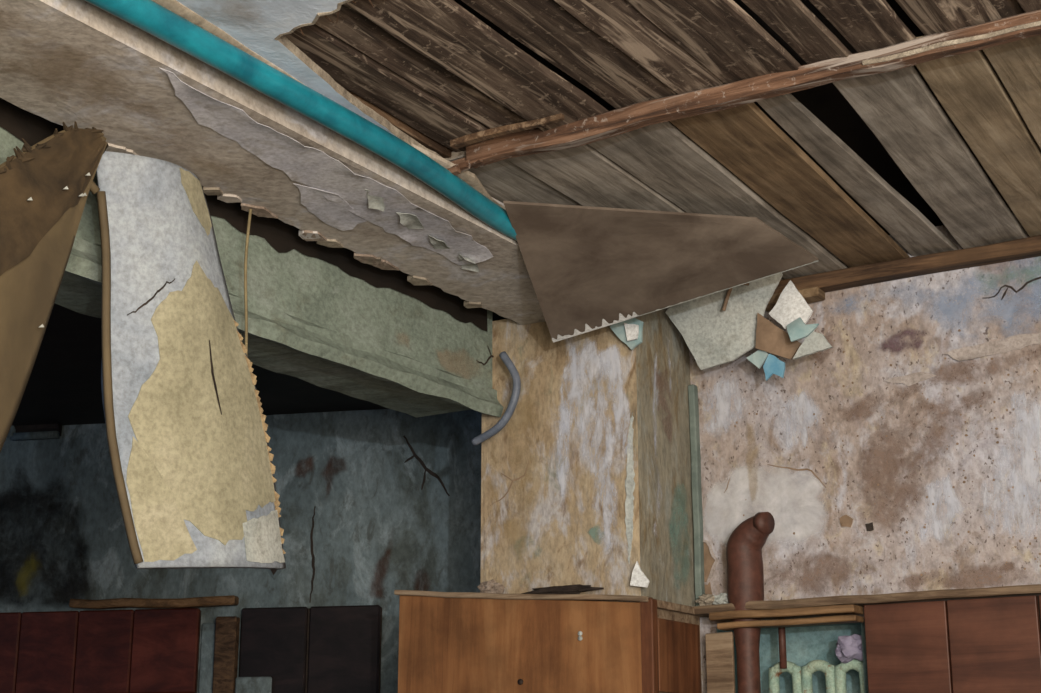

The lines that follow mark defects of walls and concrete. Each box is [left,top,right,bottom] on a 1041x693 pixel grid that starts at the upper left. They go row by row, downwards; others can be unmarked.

peeling [159,67,493,285]
crack [982,277,1041,300]
peeling [126,260,275,562]
damp [558,342,630,548]